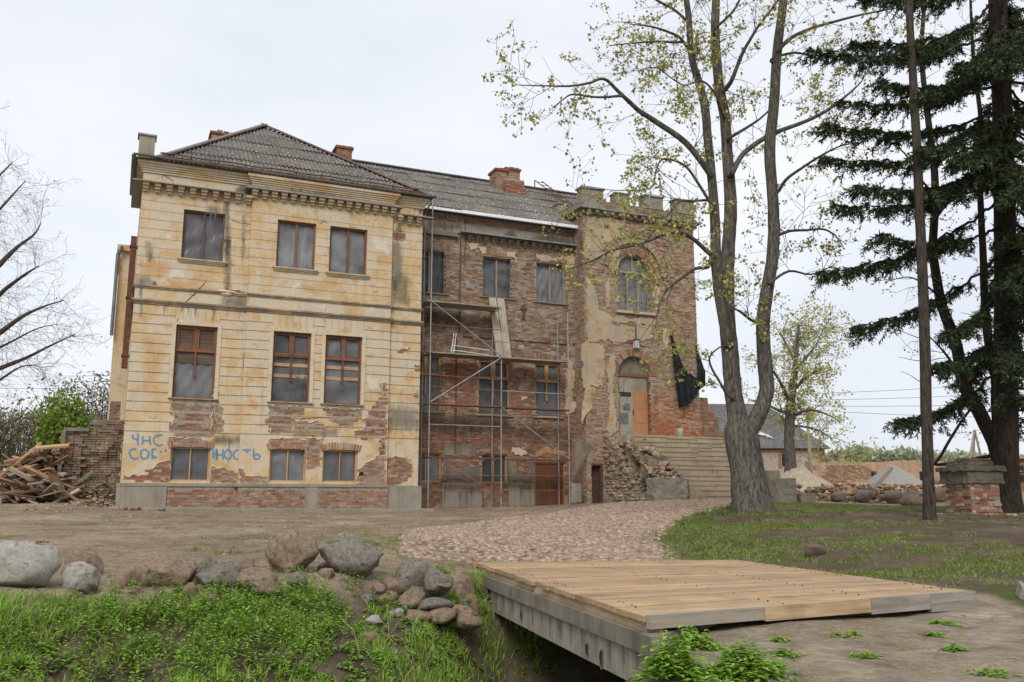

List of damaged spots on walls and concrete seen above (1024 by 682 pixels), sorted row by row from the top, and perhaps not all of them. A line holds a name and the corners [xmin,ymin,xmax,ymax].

damp [392,228,407,301]
peeling [536,216,670,433]
spalling [169,389,224,447]
spalling [265,376,413,486]
spalling [123,460,171,482]